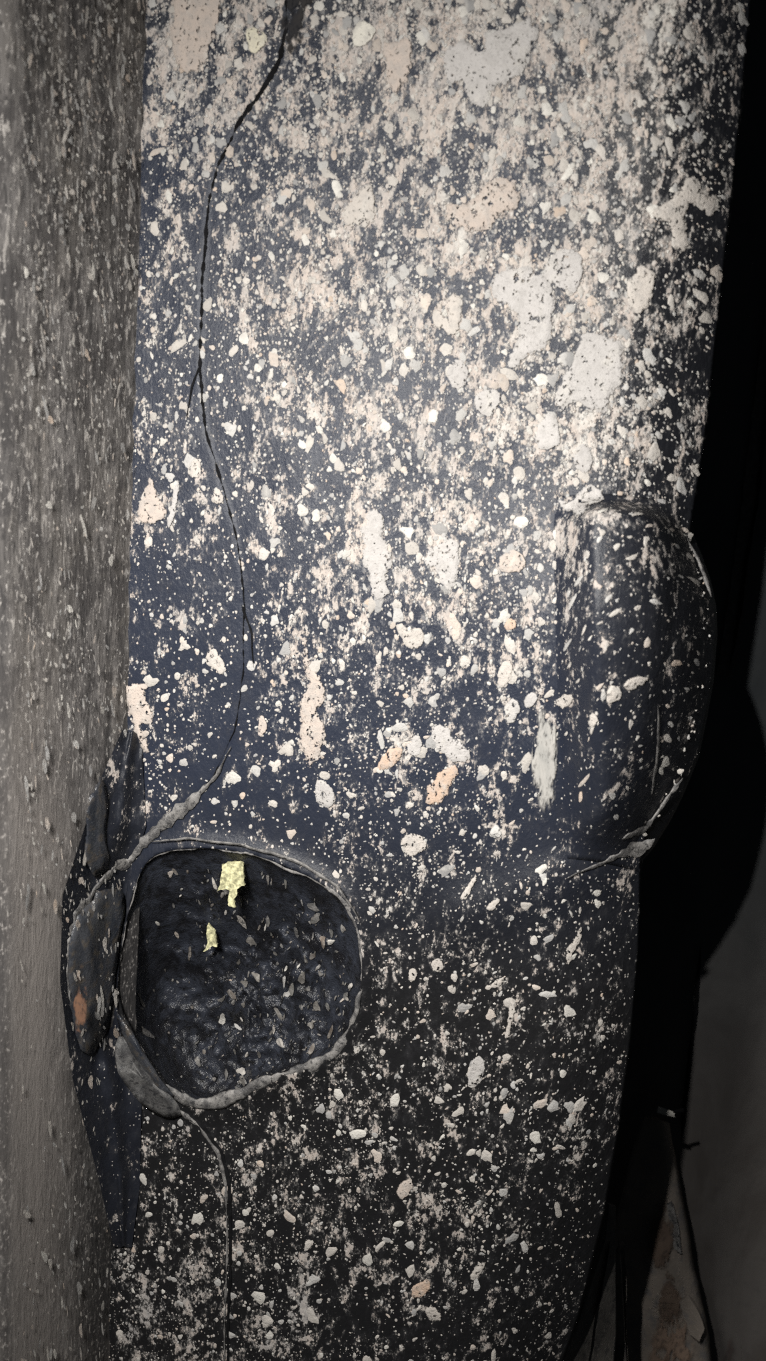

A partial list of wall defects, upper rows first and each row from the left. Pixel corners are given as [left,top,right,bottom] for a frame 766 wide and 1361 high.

crack [186,0,287,784]